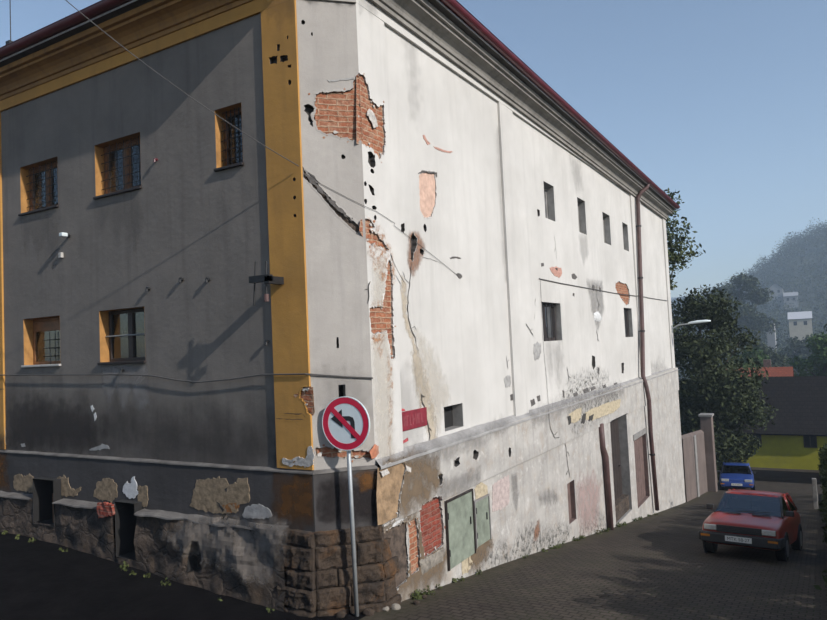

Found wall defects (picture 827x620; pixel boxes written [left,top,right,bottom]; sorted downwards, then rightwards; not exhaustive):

flaking render [308,72,387,163]
flaking render [418,169,437,220]
flaking render [305,172,396,361]
crack [389,255,440,349]
flaking render [615,280,630,306]
flaking render [294,385,315,415]
flaking render [282,444,379,467]
flaking render [13,473,34,493]
flaking render [57,475,82,497]
flaking render [93,476,148,518]
flaking render [190,476,273,519]
flaking render [376,457,446,590]